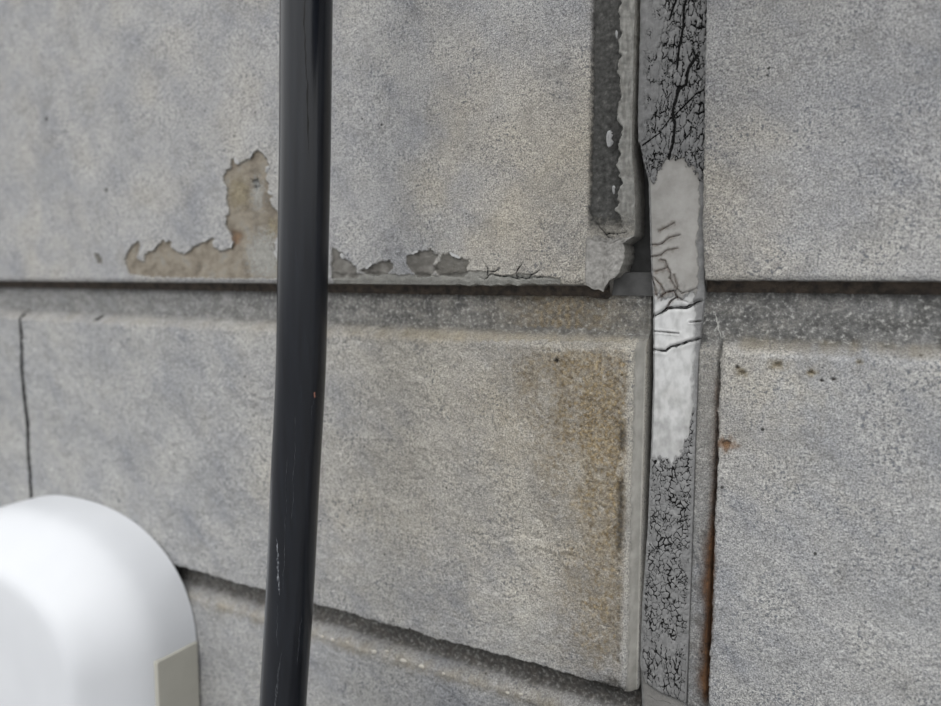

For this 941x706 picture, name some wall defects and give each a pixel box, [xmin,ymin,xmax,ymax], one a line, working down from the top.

crack [642,0,707,182]
peeling [125,151,278,279]
peeling [332,249,393,278]
peeling [407,249,438,277]
spalling [585,235,634,291]
crack [652,224,718,352]
crack [19,312,33,499]
crack [643,415,693,703]